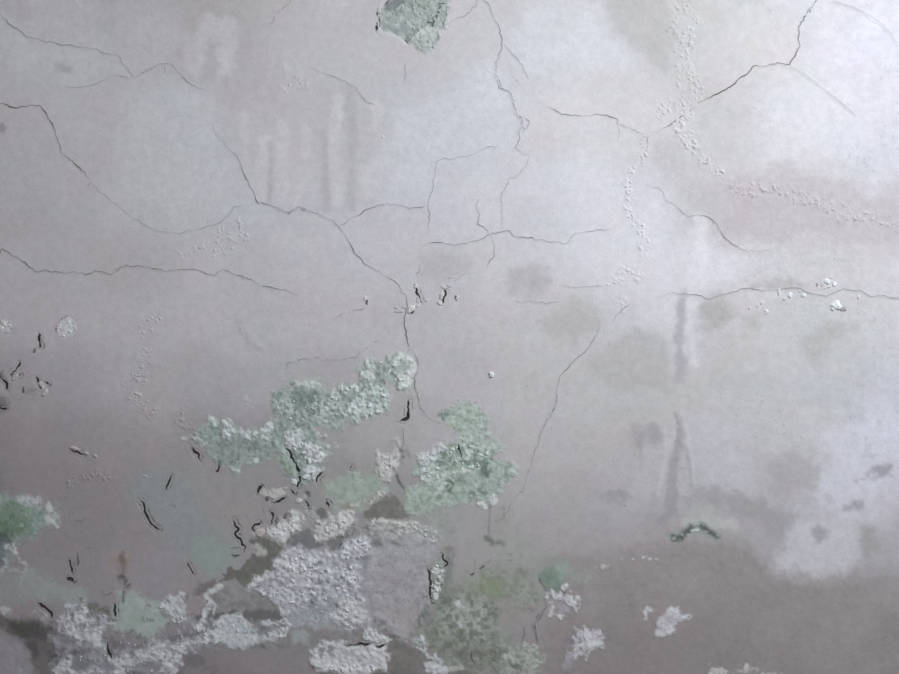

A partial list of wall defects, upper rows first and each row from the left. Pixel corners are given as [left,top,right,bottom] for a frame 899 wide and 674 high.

flaking render [362,0,452,63]
crack [0,0,899,460]
peeling [0,360,52,418]
peeling [33,331,44,353]
peeling [68,446,97,459]
leakage [0,396,524,674]
peeling [249,470,325,537]
leakage [179,348,417,489]
flaking render [355,532,445,650]
crack [506,303,631,514]
leakage [499,129,899,674]